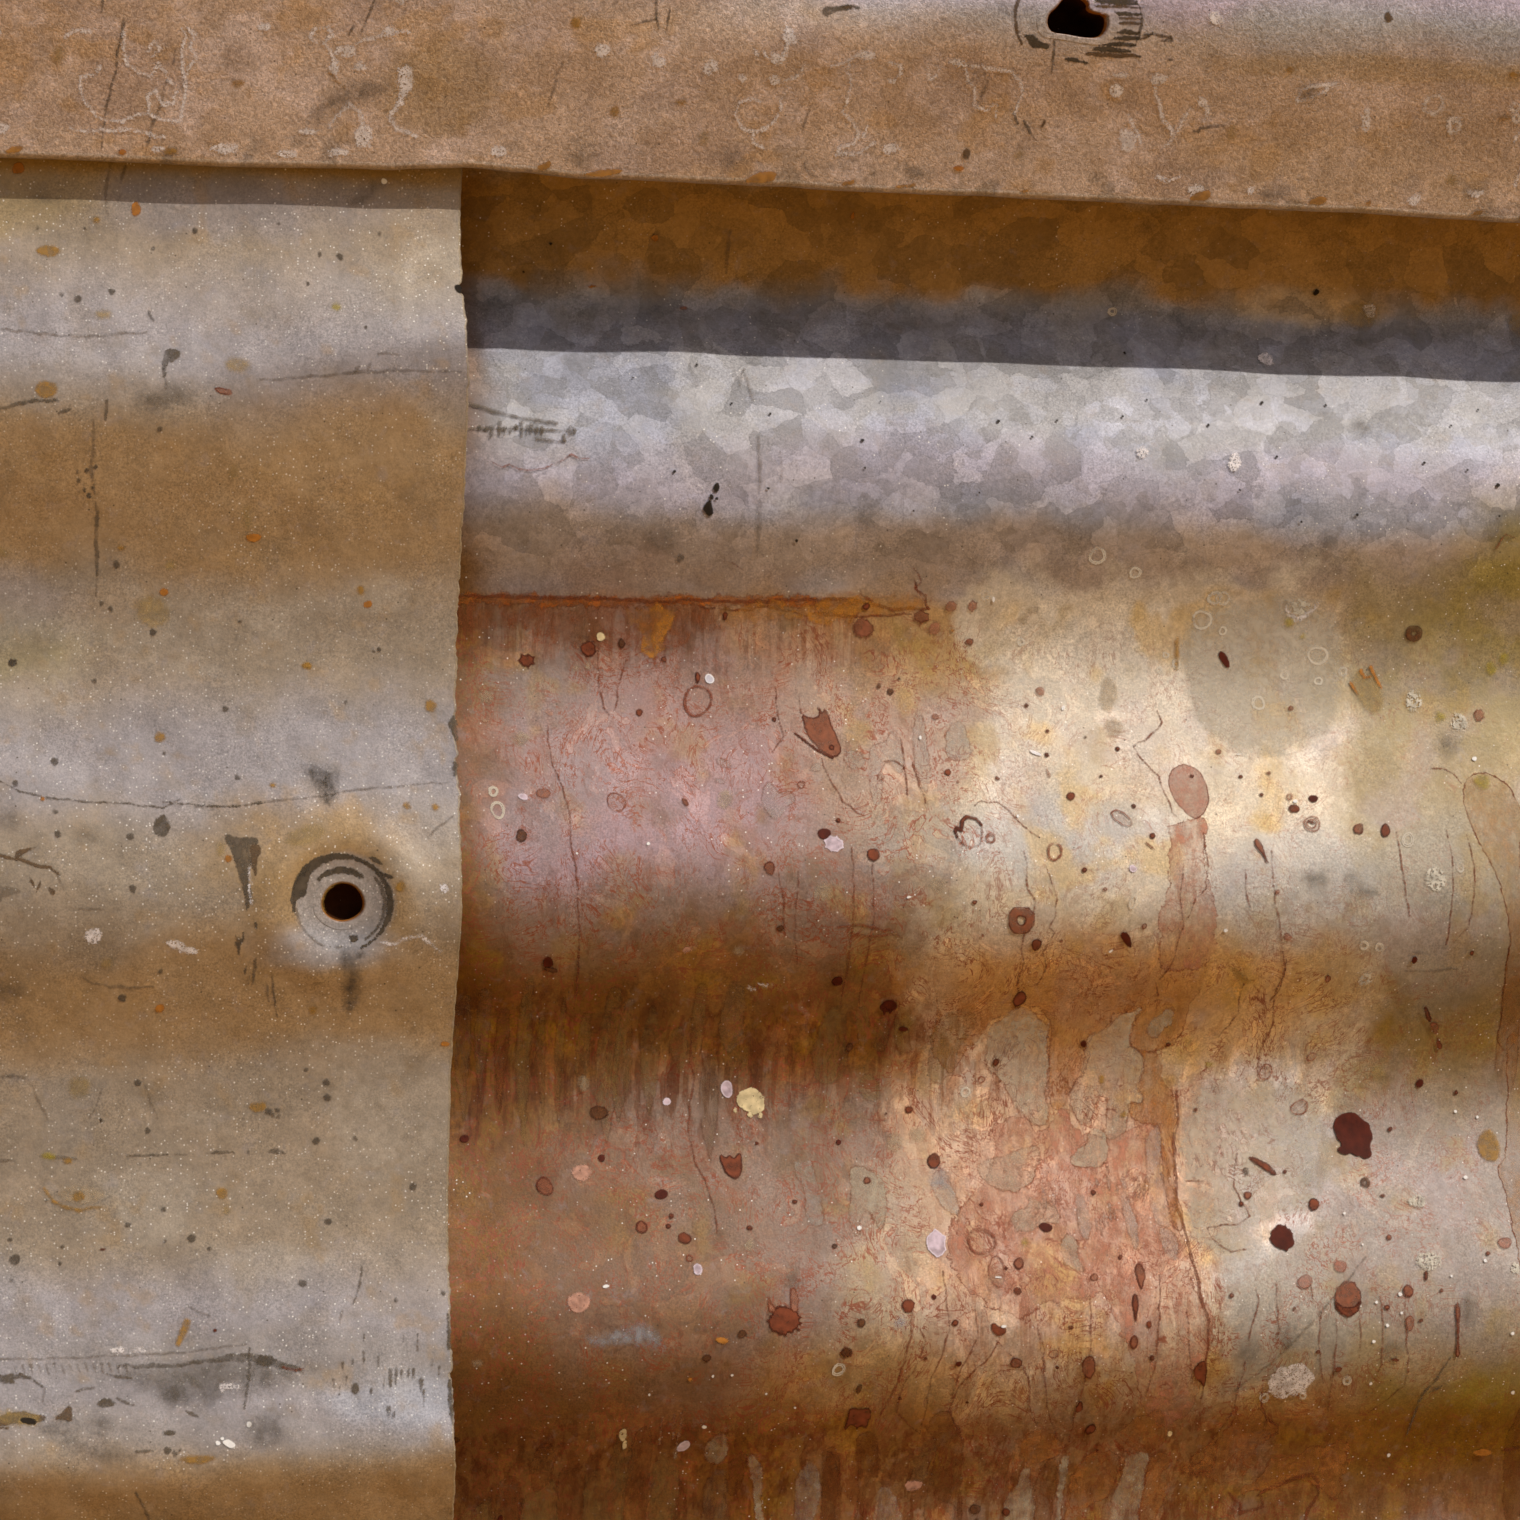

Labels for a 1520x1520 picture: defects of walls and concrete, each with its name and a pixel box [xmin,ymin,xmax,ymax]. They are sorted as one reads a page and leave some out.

rust [458,584,977,662]
rust [794,708,841,759]
rust [954,815,995,846]
rust [1287,794,1320,832]
rust [1121,764,1216,948]
rust [1008,907,1063,951]
rust [1334,1112,1392,1159]
rust [927,1153,940,1169]
rust [1249,1157,1287,1175]
rust [947,1043,1213,1427]
rust [1270,1224,1295,1251]
rust [1335,1261,1361,1317]